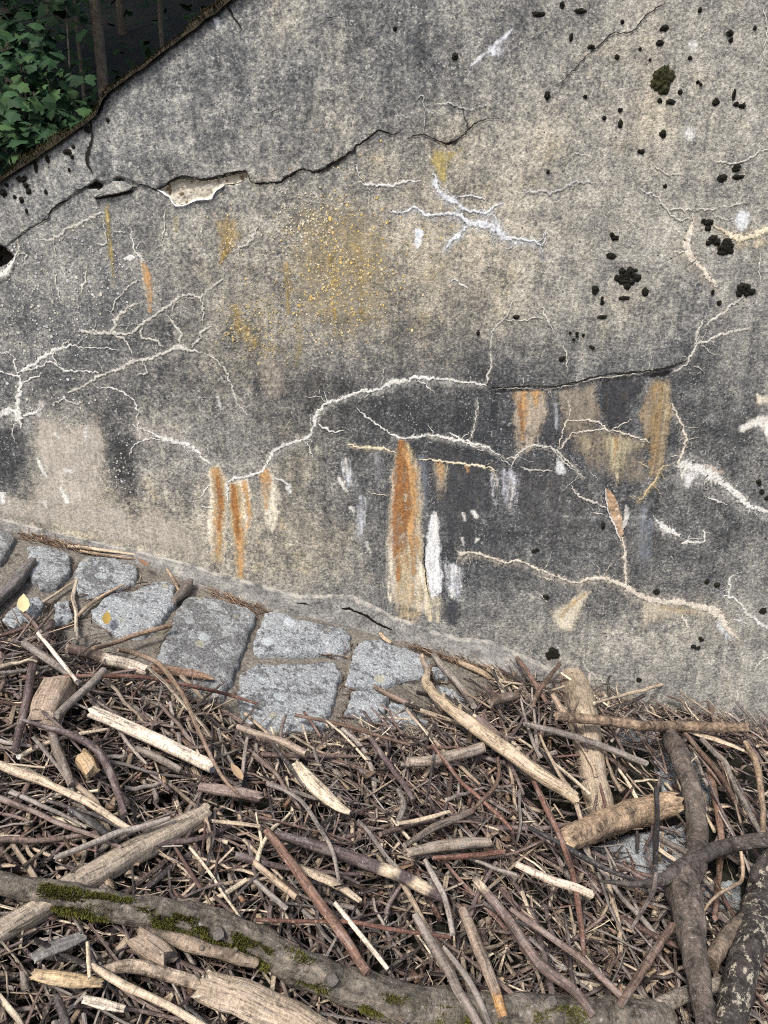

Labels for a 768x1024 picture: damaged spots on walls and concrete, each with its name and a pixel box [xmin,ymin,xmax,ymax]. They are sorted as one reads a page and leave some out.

crack [556,0,667,85]
spalling [158,173,246,207]
leakage [732,210,768,248]
crack [0,93,768,546]
rust [513,380,672,485]
leakage [739,393,768,439]
rust [207,465,281,579]
leakage [338,458,371,553]
rust [385,440,428,622]
leakage [418,446,590,627]
crack [342,607,393,631]
crack [457,537,768,640]